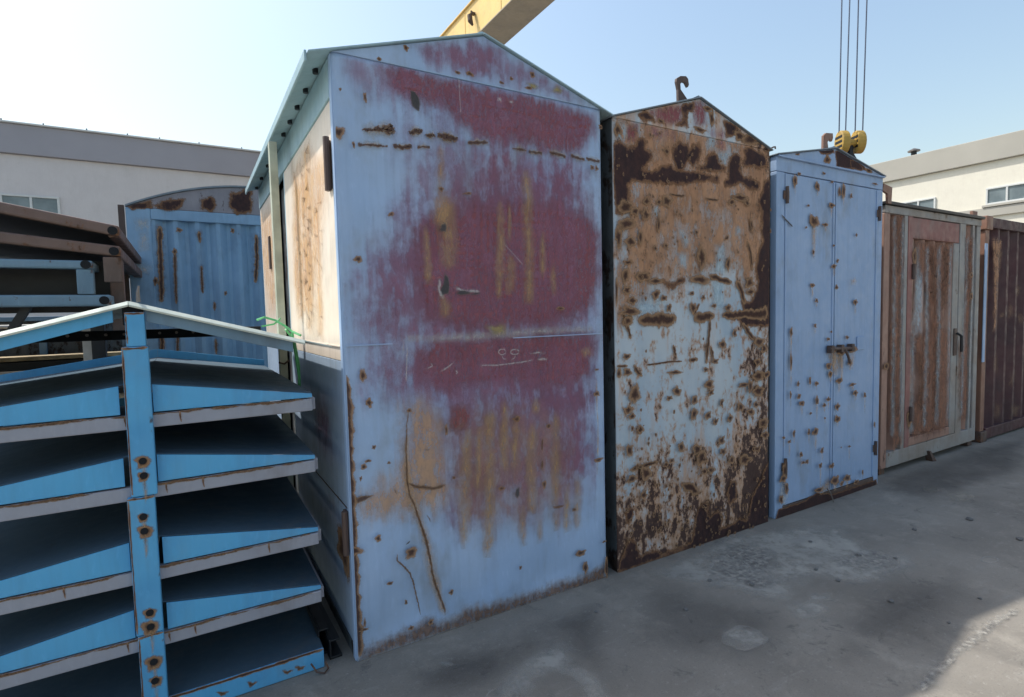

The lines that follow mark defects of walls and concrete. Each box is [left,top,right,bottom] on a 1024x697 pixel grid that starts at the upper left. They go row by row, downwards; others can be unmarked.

rust [128,198,184,211]
rust [201,196,216,212]
rust [229,189,253,215]
rust [153,226,182,304]
rust [254,227,273,301]
rust [965,237,973,323]
rust [993,241,1001,329]
rust [884,215,968,450]
rust [336,102,878,658]
rust [121,312,179,697]